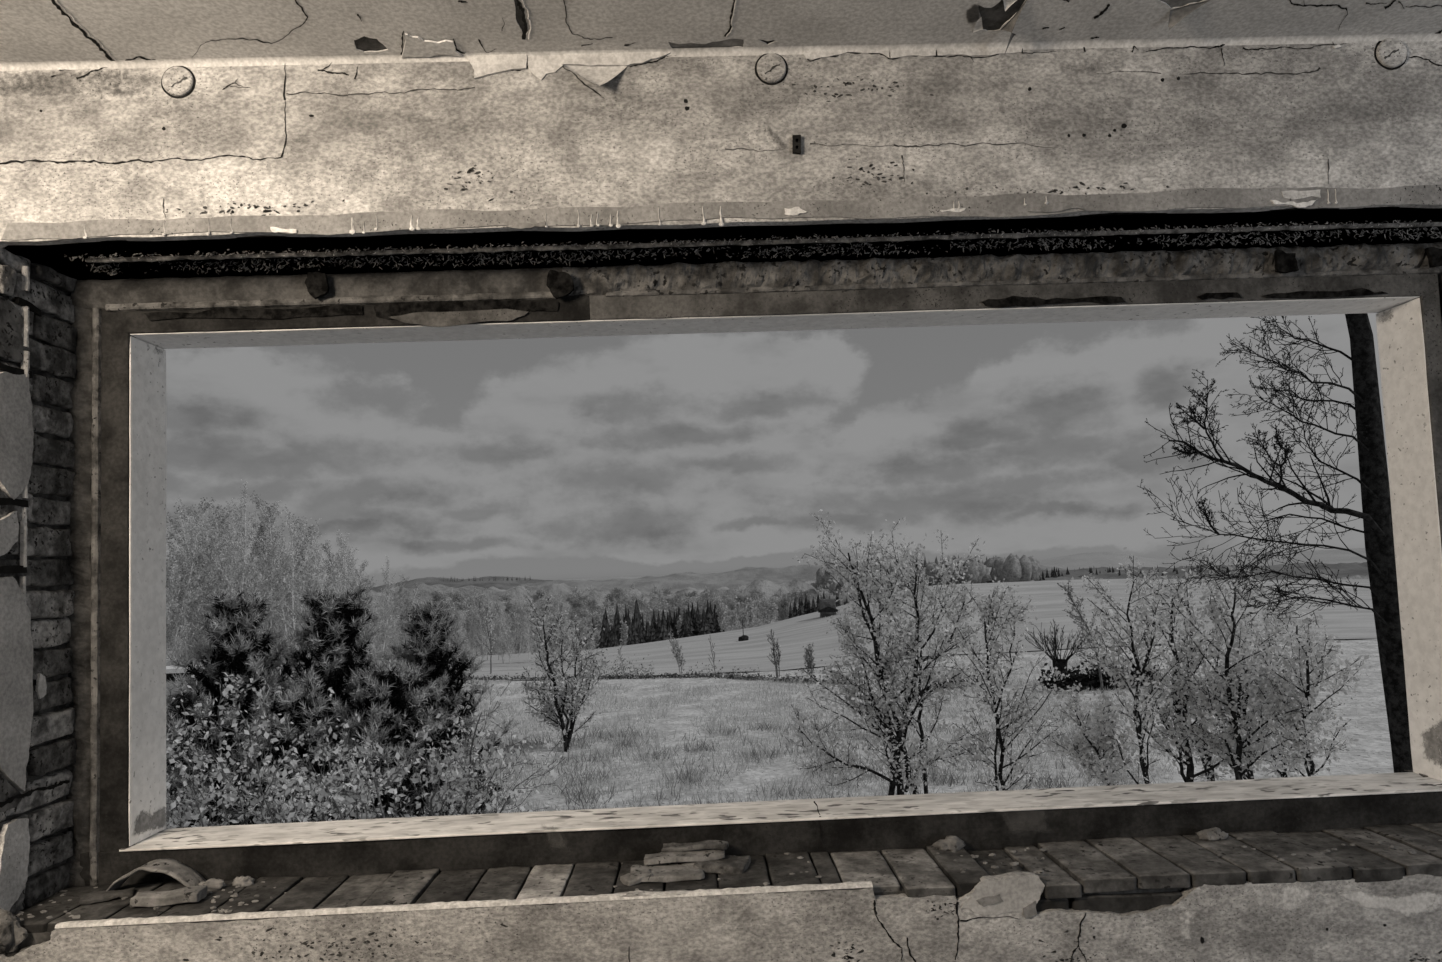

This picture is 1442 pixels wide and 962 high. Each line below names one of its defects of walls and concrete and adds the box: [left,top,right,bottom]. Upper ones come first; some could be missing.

crack [453,0,668,96]
crack [807,0,1442,75]
peeling [1161,0,1210,30]
crack [0,0,475,164]
peeling [976,894,1003,907]
spalling [0,908,28,954]
crack [873,900,916,962]
crack [955,902,1017,960]
crack [1071,913,1087,962]